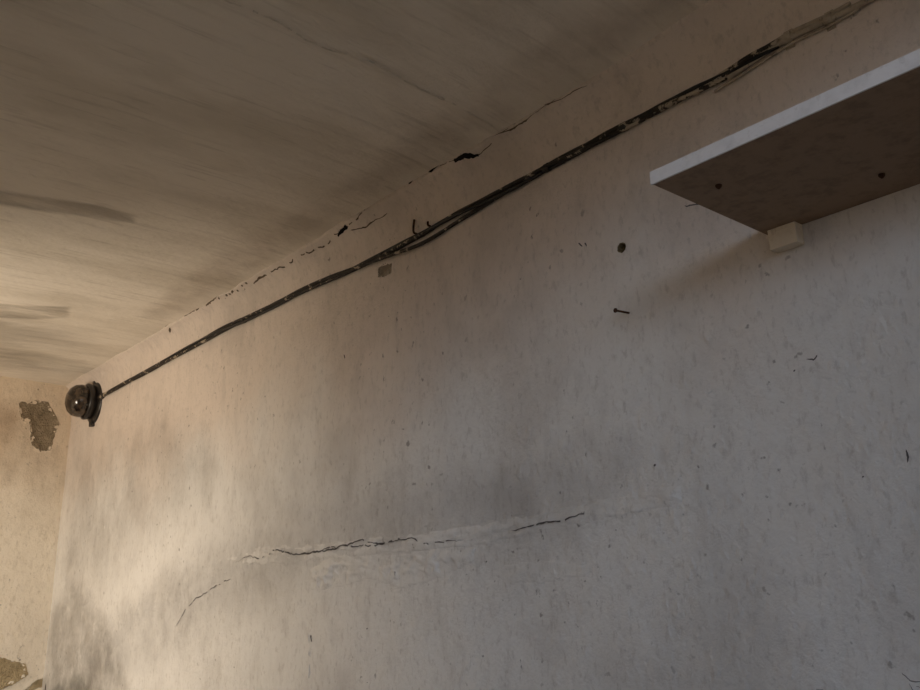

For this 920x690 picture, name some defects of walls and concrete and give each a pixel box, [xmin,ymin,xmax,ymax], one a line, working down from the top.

crack [224,0,586,184]
crack [165,212,387,332]
flaking render [19,400,59,452]
flaking render [0,658,43,690]